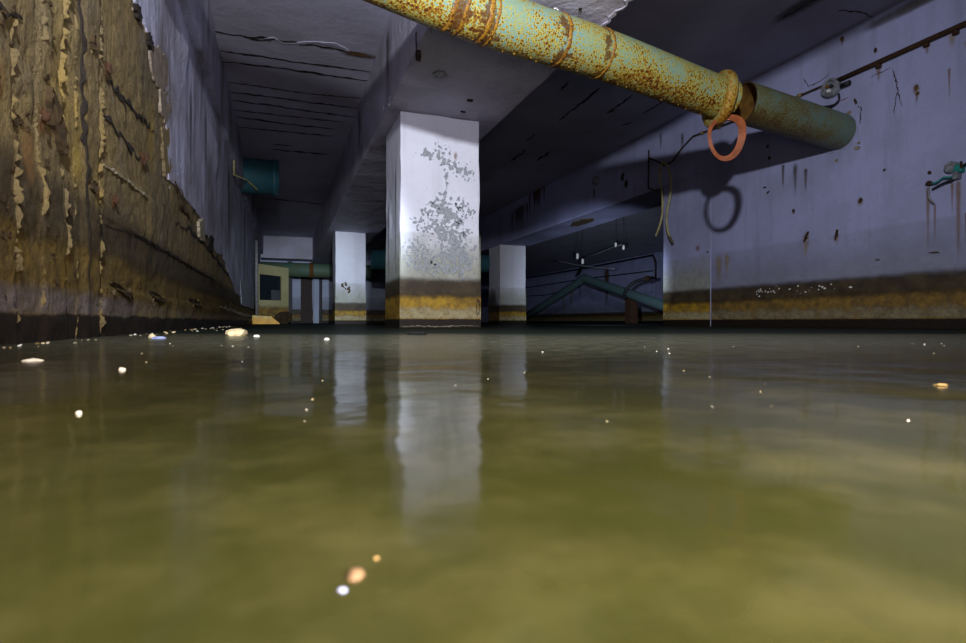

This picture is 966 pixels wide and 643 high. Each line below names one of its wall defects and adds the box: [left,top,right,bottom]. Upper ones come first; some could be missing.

spalling [601,0,632,27]
spalling [0,0,255,336]
leakage [0,162,625,345]
peeling [402,143,477,282]
leakage [638,271,966,329]